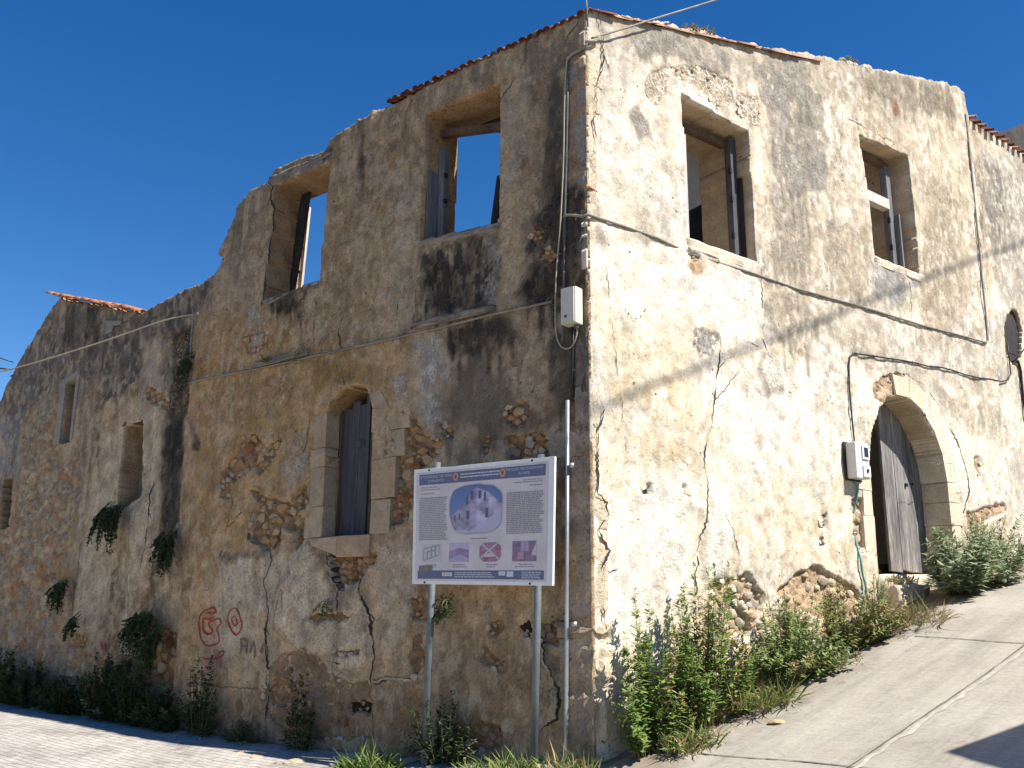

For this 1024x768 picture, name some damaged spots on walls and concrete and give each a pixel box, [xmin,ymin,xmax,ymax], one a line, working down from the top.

flaking render [645,64,762,127]
leakage [161,327,199,539]
flaking render [391,419,454,524]
leakage [415,237,540,464]
crack [596,267,649,645]
crack [678,332,748,589]
flaking render [873,374,904,403]
crack [196,482,272,715]
crack [321,552,412,685]
crack [539,636,561,731]
flaking render [700,573,761,657]
flaking render [776,566,858,619]